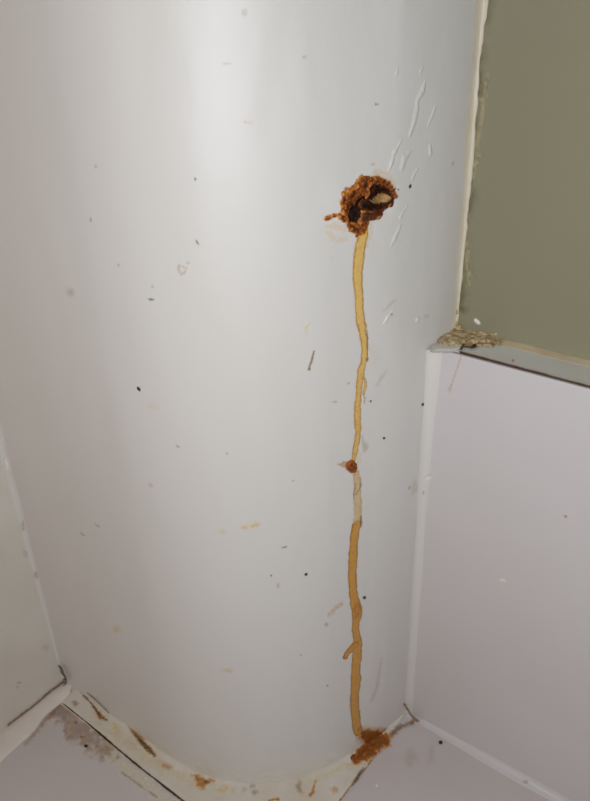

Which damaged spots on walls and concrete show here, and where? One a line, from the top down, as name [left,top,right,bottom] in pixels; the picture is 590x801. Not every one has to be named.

hole [348,182,396,223]